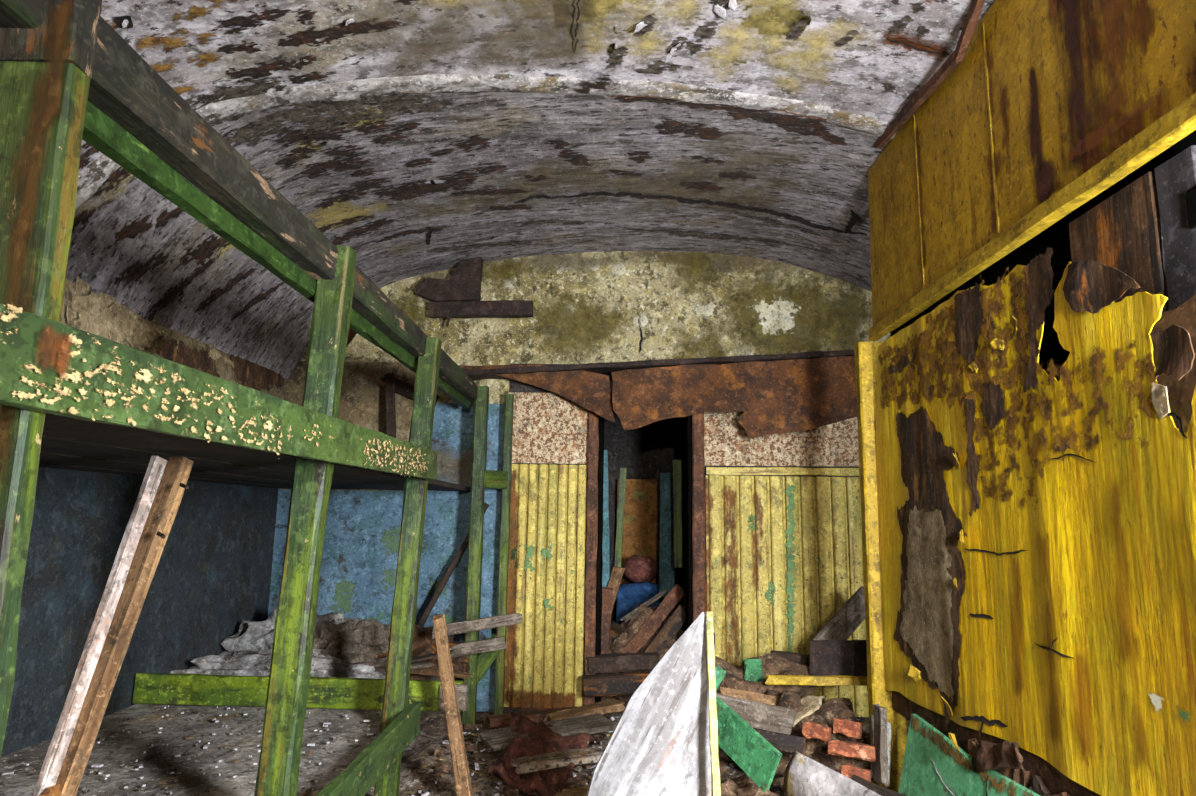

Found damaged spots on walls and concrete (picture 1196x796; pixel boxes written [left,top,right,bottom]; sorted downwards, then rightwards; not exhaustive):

leakage [745,0,846,87]
corrosion [1030,0,1169,203]
leakage [310,200,384,227]
leakage [484,139,786,209]
leakage [482,254,615,282]
mould [537,304,621,353]
leakage [635,251,872,359]
peeling [878,247,1158,796]